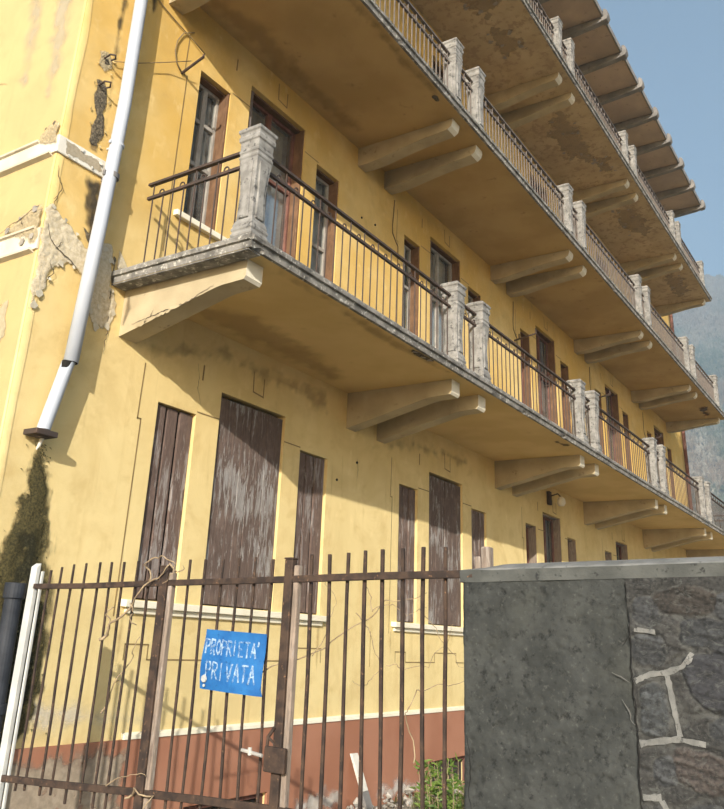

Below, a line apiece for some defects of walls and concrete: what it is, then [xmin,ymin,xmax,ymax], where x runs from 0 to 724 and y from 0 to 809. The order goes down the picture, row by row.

spalling [40,120,60,144]
spalling [66,51,116,172]
spalling [0,204,91,309]
spalling [89,243,116,352]